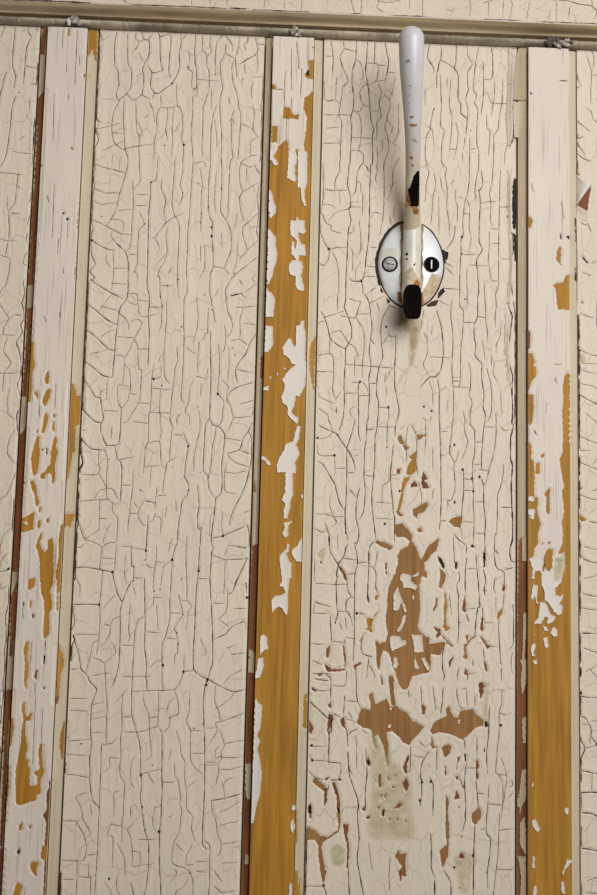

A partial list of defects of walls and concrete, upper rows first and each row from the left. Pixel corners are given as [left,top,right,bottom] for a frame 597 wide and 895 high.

peeling [28,91,44,285]
crack [30,0,90,8]
crack [125,0,327,12]
crack [447,0,597,24]
crack [559,52,597,169]
peeling [9,308,81,657]
peeling [242,91,349,895]
peeling [357,435,489,822]
peeling [517,373,587,895]
crack [554,307,597,851]
peeling [0,690,50,895]
crack [305,831,326,895]